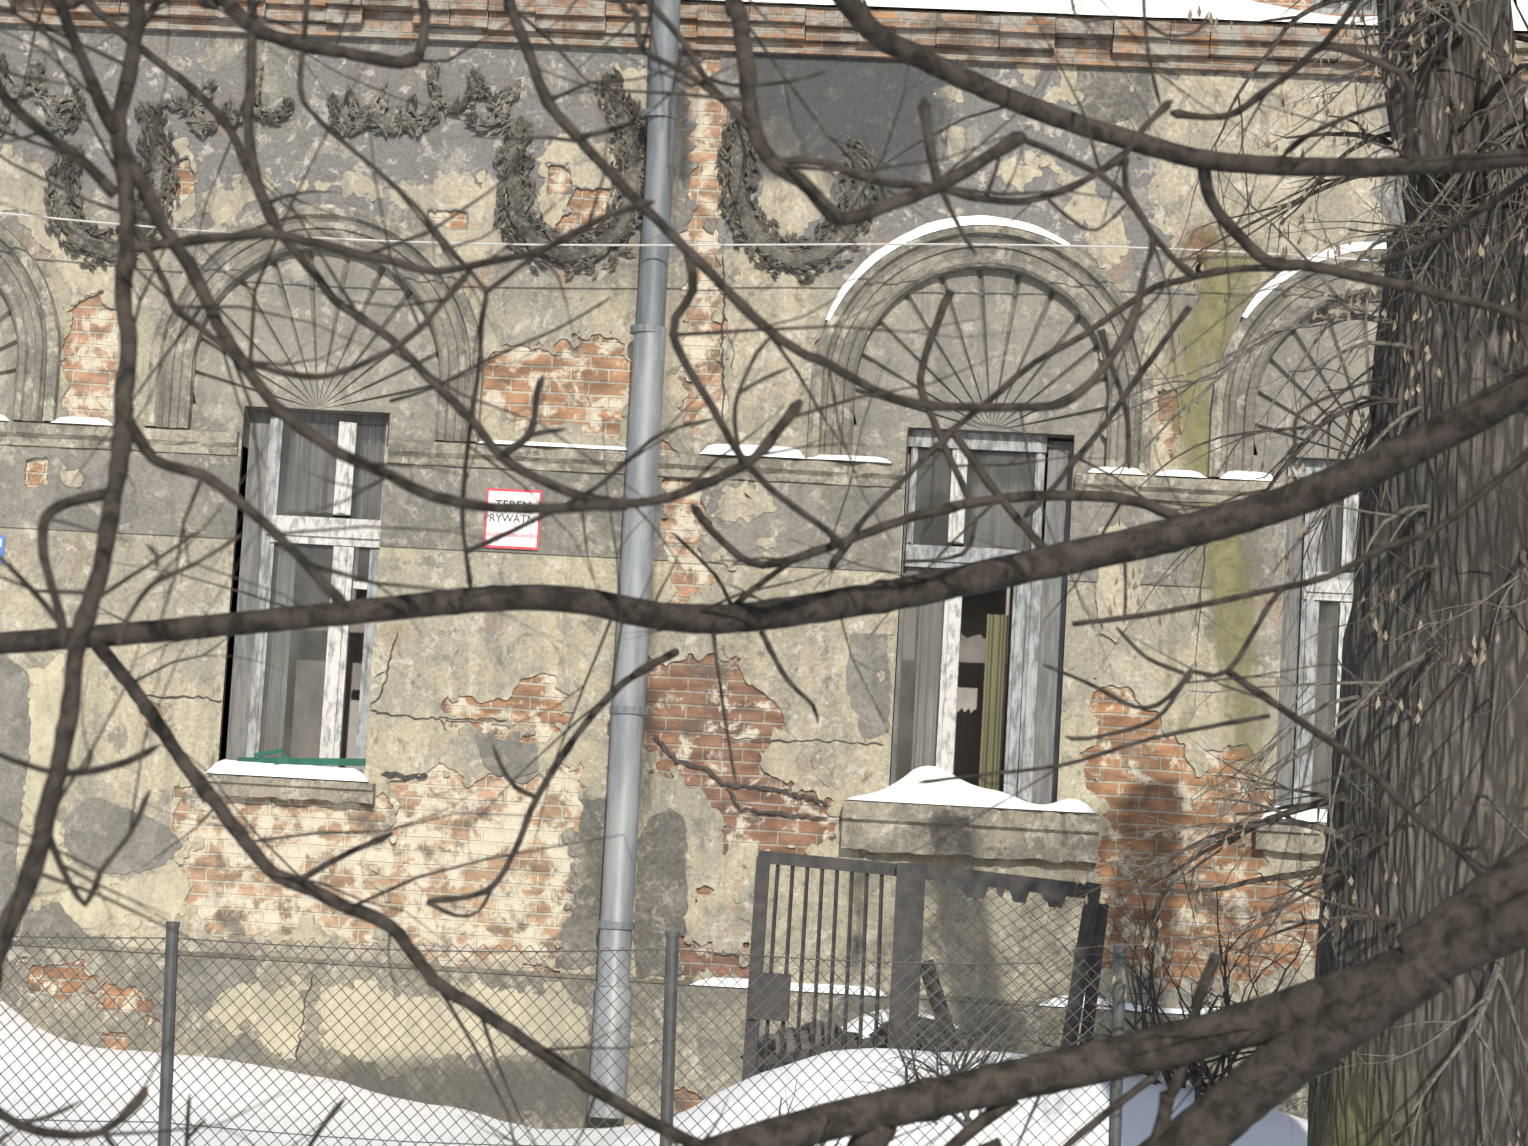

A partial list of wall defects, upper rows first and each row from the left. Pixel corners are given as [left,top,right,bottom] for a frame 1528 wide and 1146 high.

peeling [535,133,622,236]
spalling [0,144,119,426]
spalling [482,331,632,439]
spalling [661,478,874,604]
peeling [22,653,65,849]
crack [381,771,428,780]
crack [370,629,507,731]
spalling [434,673,573,743]
spalling [643,614,896,985]
spalling [921,678,1321,992]
spalling [31,757,592,1081]
spalling [8,950,160,1050]